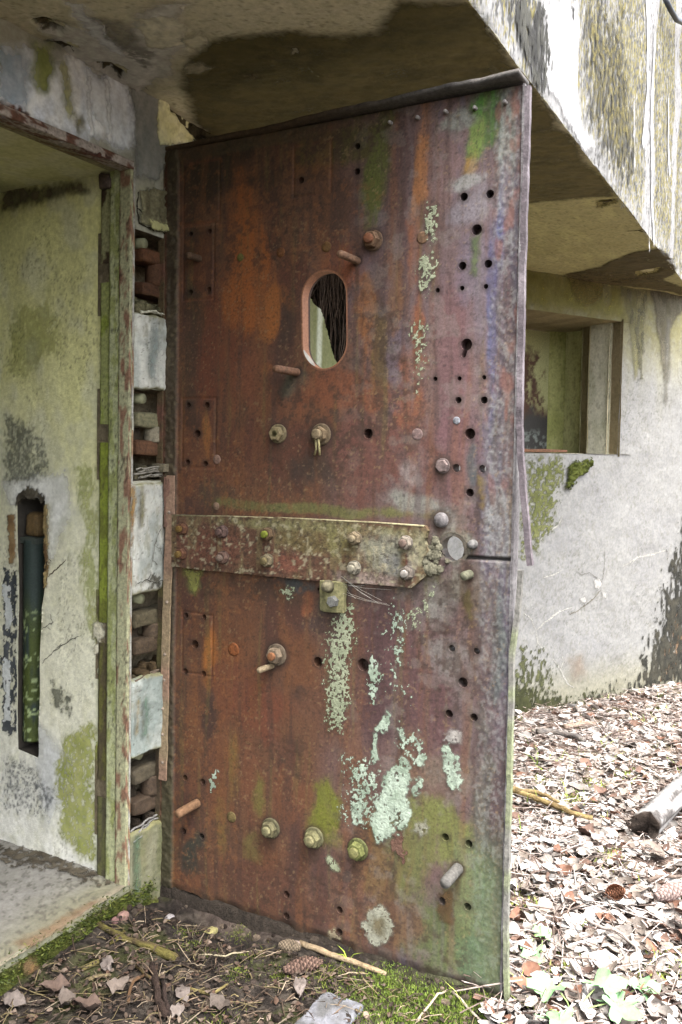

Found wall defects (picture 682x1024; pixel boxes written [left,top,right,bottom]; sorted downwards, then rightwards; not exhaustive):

damp [2,183,89,211]
damp [183,0,682,401]
damp [3,418,70,559]
peeling [0,486,49,736]
rust [183,568,202,592]
damp [515,530,682,713]
damp [50,680,72,717]
damp [2,728,69,817]